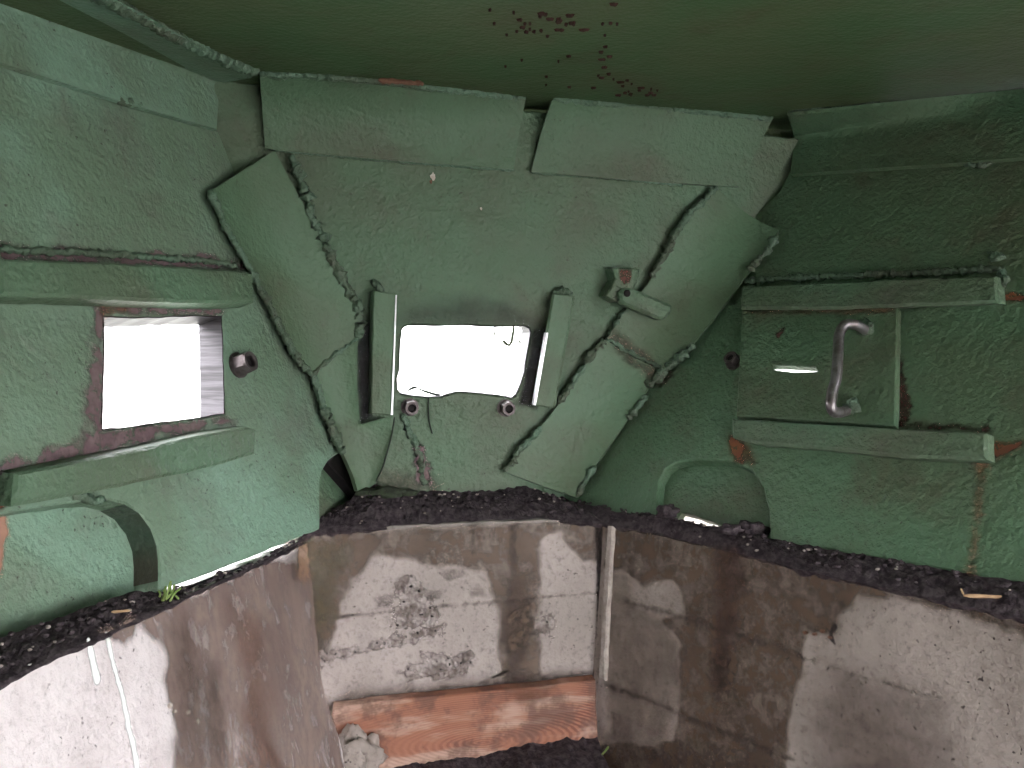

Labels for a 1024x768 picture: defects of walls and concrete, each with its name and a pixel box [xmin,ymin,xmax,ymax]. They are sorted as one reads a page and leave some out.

rust [505,11,659,97]
rust [899,348,1024,517]
rust [0,506,8,570]
spalling [319,575,475,682]
damp [101,523,1024,768]